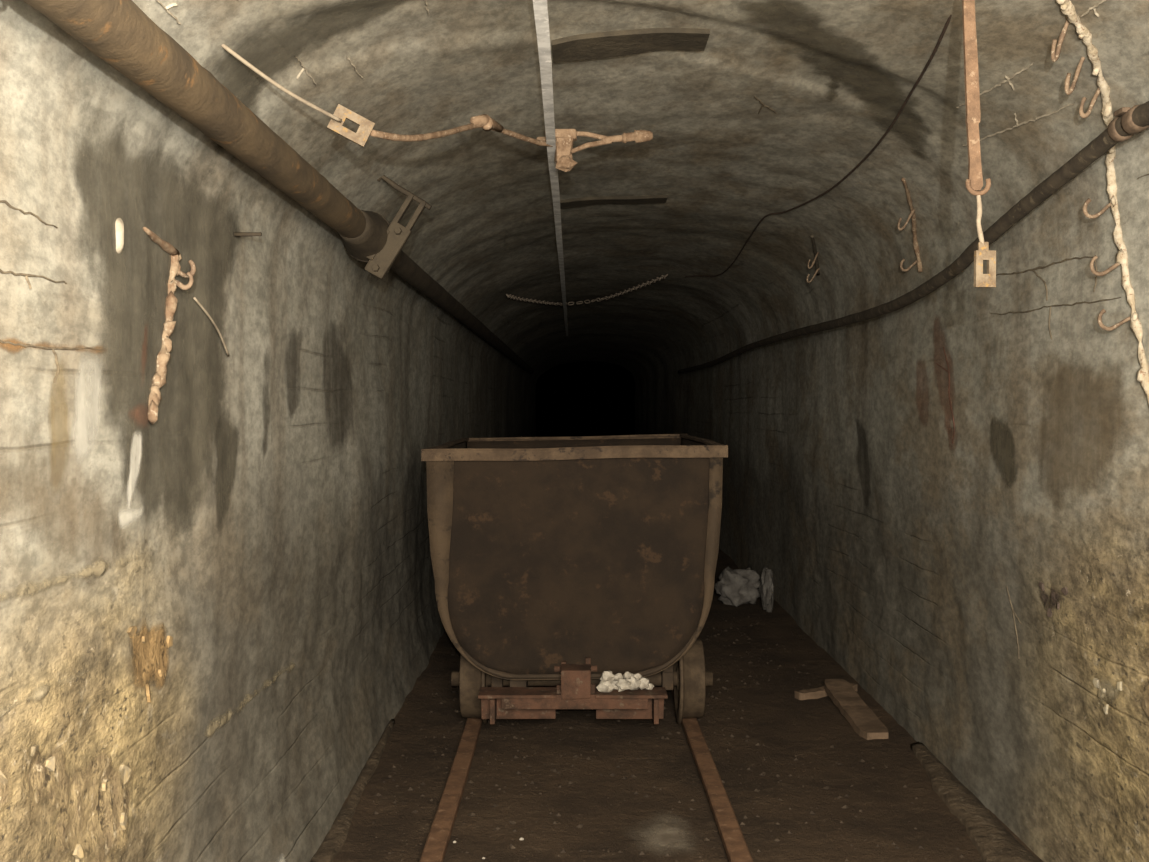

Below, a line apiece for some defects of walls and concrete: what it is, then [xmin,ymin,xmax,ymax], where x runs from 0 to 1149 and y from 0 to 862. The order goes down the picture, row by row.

crack [1081,0,1106,17]
crack [0,200,58,228]
crack [0,269,67,289]
crack [991,256,1121,339]
leakage [63,128,239,545]
crack [0,340,105,383]